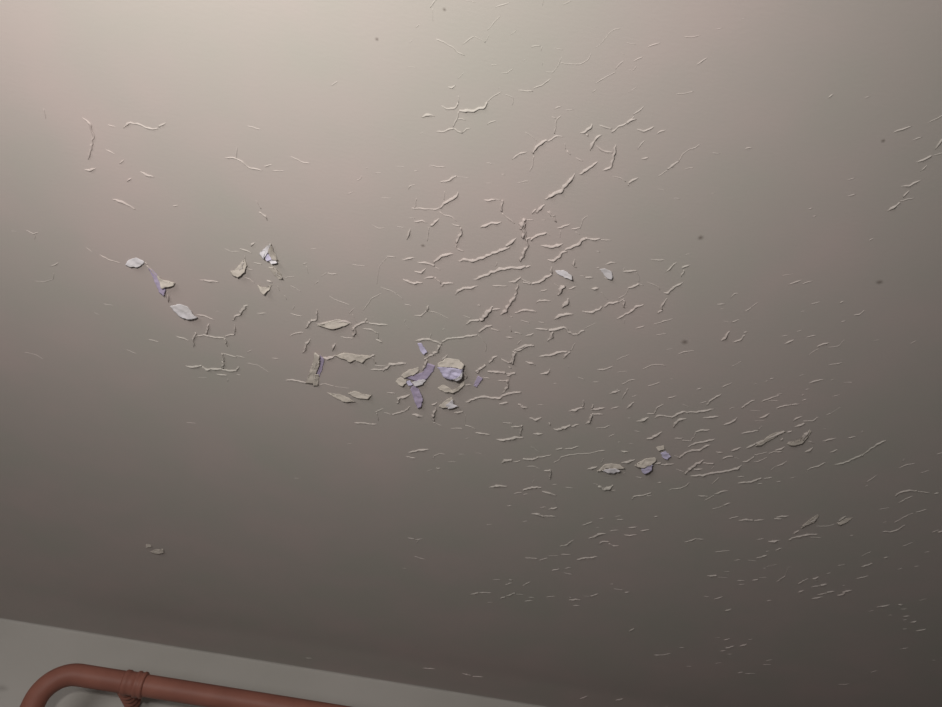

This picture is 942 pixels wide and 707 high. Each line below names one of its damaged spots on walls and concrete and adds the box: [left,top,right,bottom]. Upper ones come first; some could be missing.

peeling [87,248,197,320]
peeling [226,243,295,295]
peeling [401,343,465,394]
peeling [597,445,679,474]